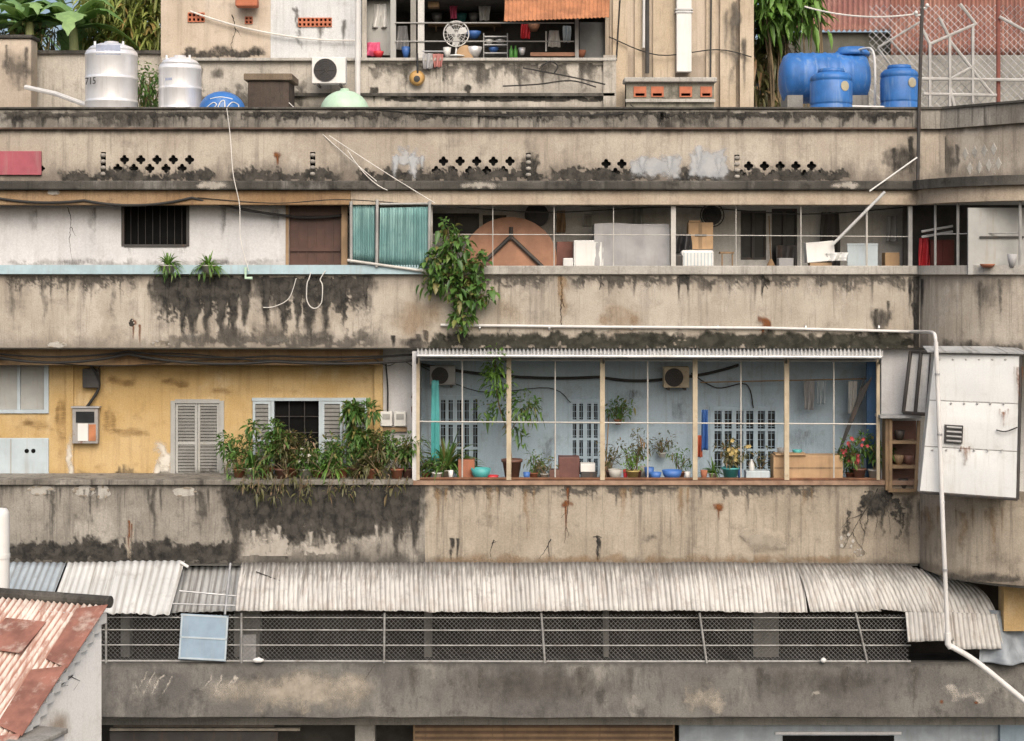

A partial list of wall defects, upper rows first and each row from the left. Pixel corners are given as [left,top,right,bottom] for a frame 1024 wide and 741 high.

damp [5,63,913,127]
damp [147,276,375,347]
crack [558,275,566,325]
damp [572,274,799,292]
peeling [154,443,171,473]
damp [10,485,541,563]
mould [842,488,920,538]